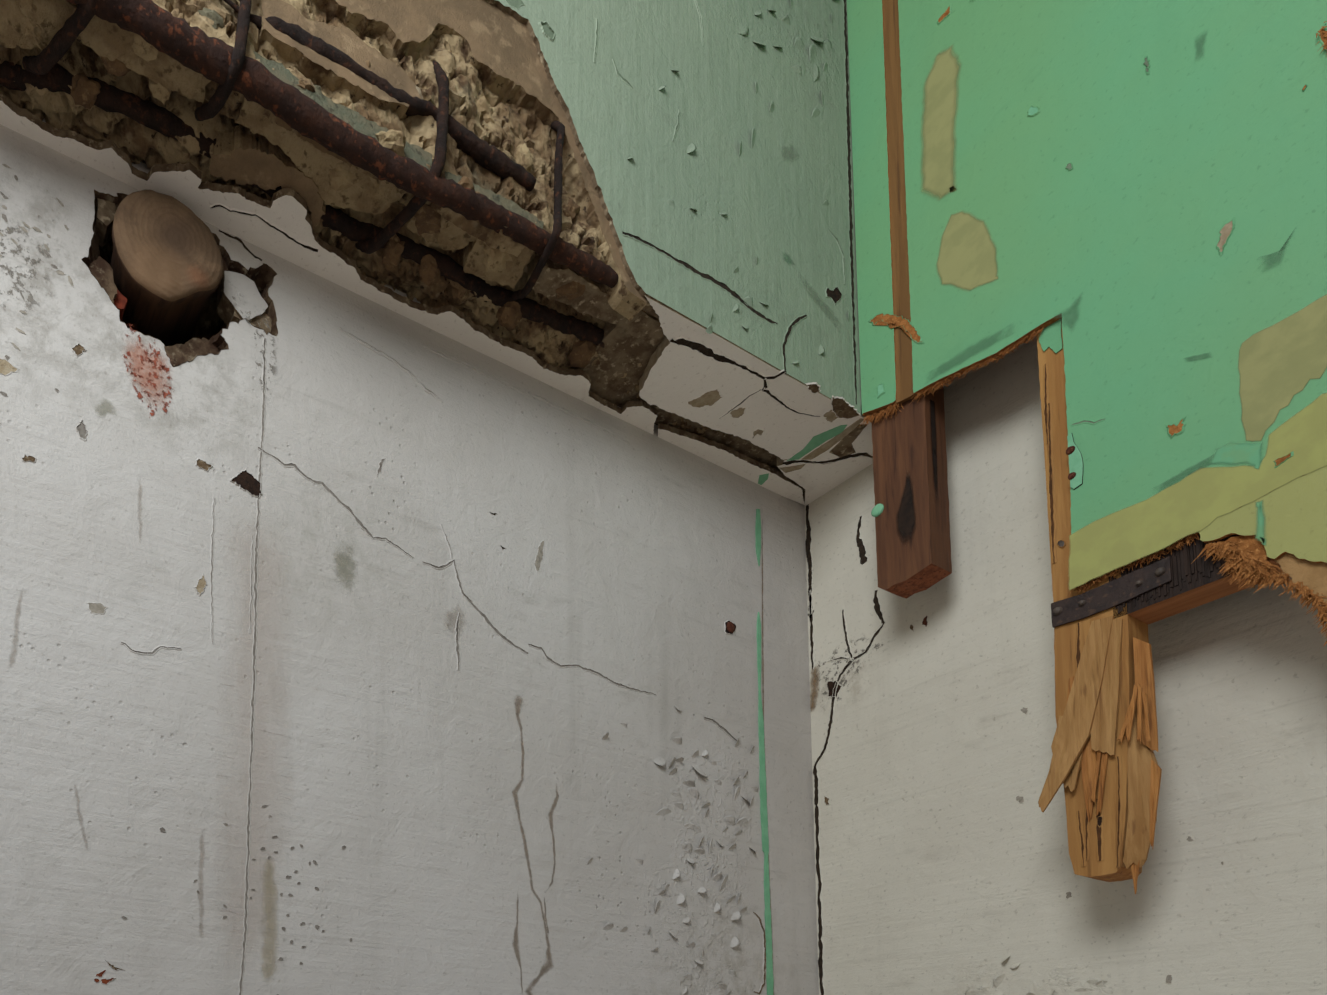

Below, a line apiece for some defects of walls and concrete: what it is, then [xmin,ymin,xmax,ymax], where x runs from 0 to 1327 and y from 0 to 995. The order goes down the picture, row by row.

spalling [0,0,665,369]
corrosion [124,325,172,416]
crack [622,231,822,419]
crack [782,451,867,466]
crack [121,497,216,656]
crack [238,327,657,995]
crack [805,504,886,995]